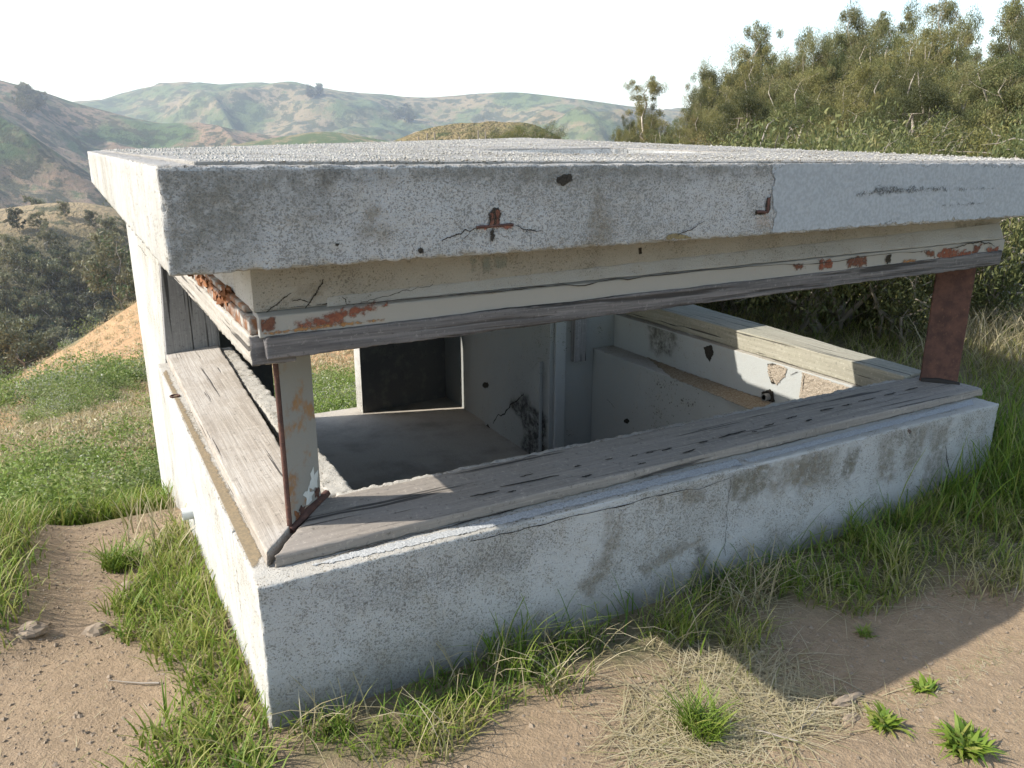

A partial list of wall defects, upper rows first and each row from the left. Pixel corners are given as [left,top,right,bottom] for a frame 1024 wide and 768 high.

rust [755,196,771,215]
peeling [772,162,1024,233]
rust [476,208,514,242]
rust [187,275,232,307]
crack [267,280,323,312]
rust [261,301,388,335]
leakage [647,327,770,410]
spalling [704,345,714,362]
spalling [761,363,787,402]
spalling [799,372,849,398]
leakage [511,396,546,454]
peeling [294,467,320,520]